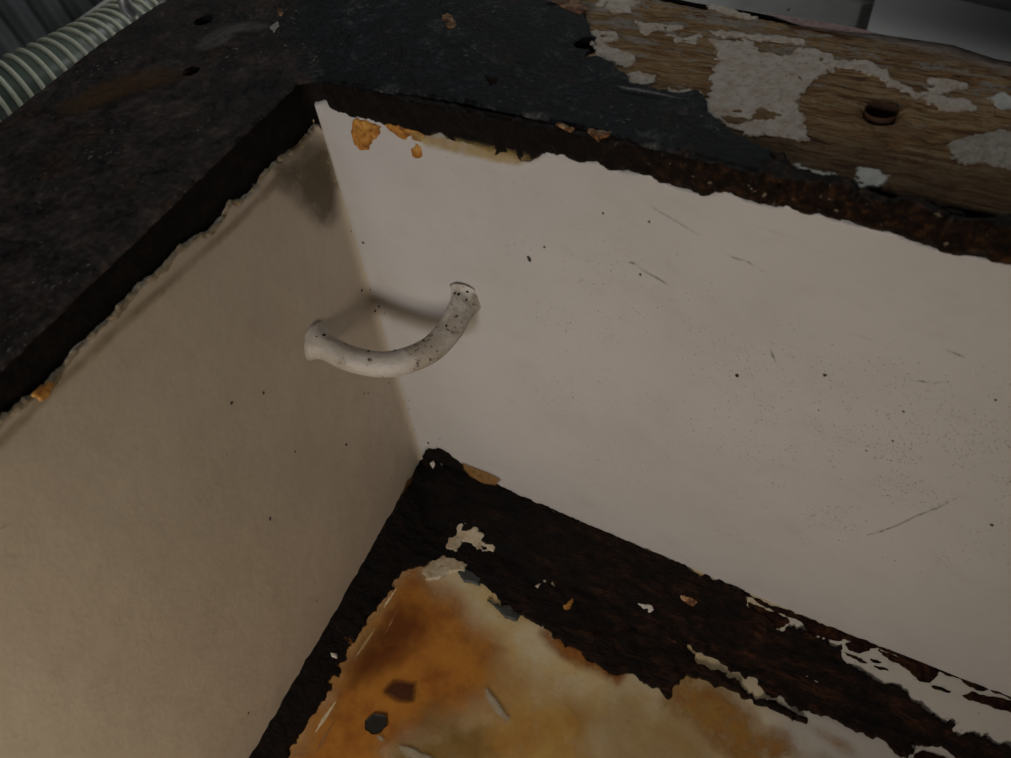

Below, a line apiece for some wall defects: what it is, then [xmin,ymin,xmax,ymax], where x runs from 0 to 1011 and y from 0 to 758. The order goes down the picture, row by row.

rust [548,0,588,14]
peeling [590,0,979,142]
peeling [986,92,1011,110]
rust [351,118,426,158]
rust [587,128,612,142]
peeling [947,129,1011,170]
peeling [792,163,837,175]
peeling [853,167,891,189]
rust [31,381,54,402]
rust [249,458,1011,758]
peeling [740,590,1011,712]
peeling [913,750,945,758]